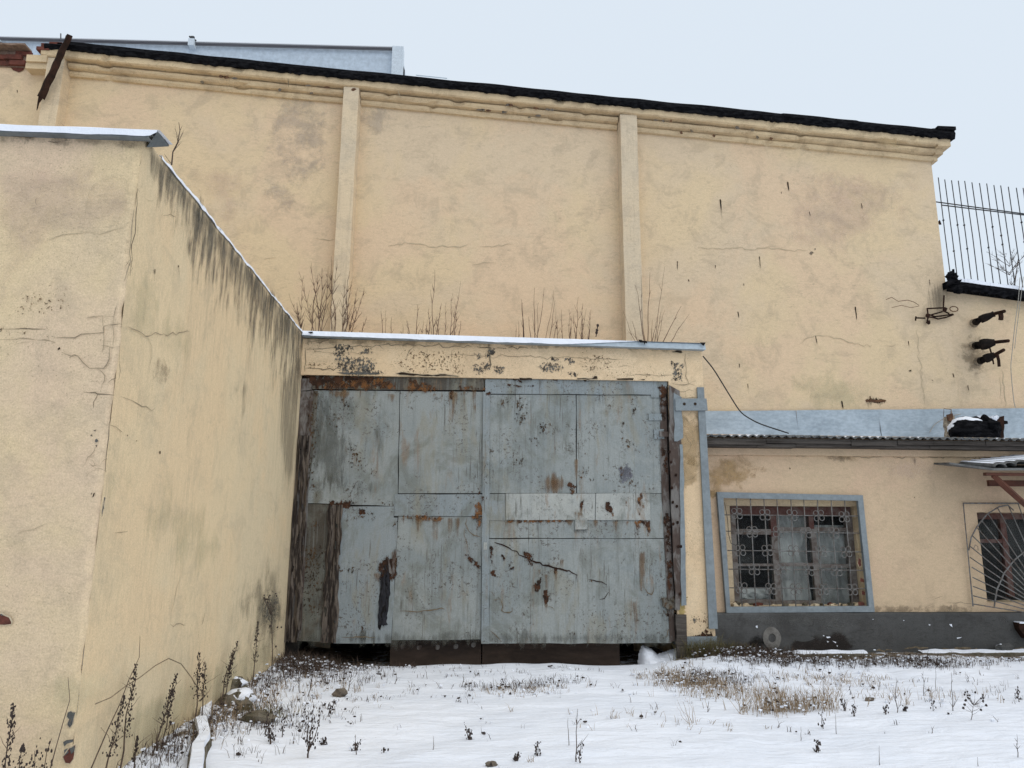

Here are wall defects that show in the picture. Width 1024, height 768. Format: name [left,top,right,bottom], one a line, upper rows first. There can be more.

crack [47,163,175,281]
leakage [151,156,303,375]
peeling [309,344,505,377]
peeling [539,350,684,381]
crack [0,306,190,475]
rust [304,375,492,412]
rust [403,502,482,534]
rust [507,460,584,525]
rust [602,493,651,536]
crack [462,509,609,600]
rust [533,560,563,605]
flaking render [0,612,13,626]